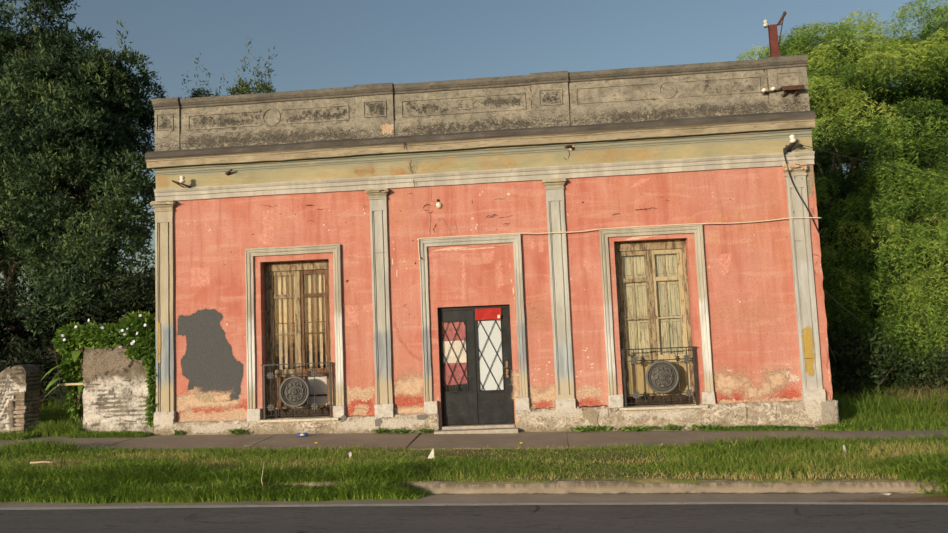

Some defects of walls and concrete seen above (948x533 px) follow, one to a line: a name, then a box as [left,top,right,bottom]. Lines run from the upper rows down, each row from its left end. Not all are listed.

peeling [516,348,699,422]
peeling [159,396,248,434]
peeling [342,386,426,432]